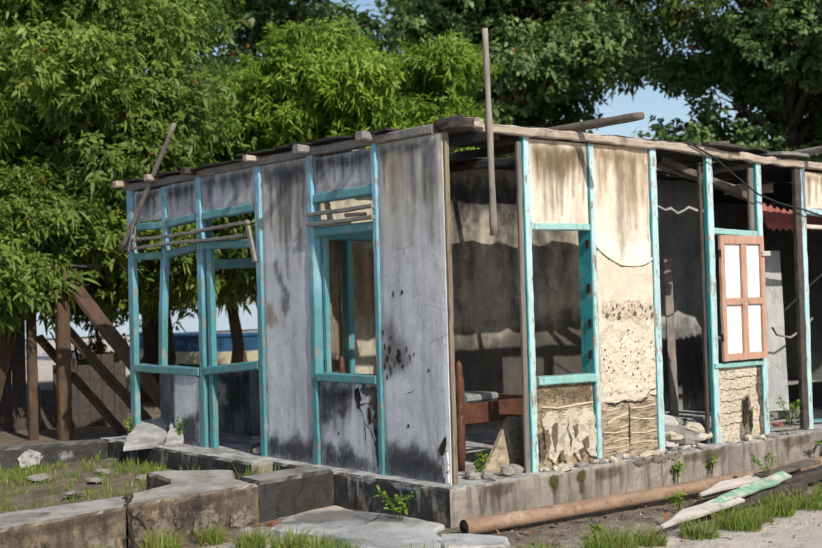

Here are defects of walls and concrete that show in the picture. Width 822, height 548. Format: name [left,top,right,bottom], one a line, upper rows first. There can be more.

leakage [450,180,517,308]
peeling [596,245,656,402]
leakage [268,436,313,461]
leakage [320,382,352,422]
leakage [323,444,375,491]
crack [353,385,376,451]
leakage [385,444,445,500]
peeling [538,407,597,465]
spalling [740,365,764,439]
crack [122,495,146,548]